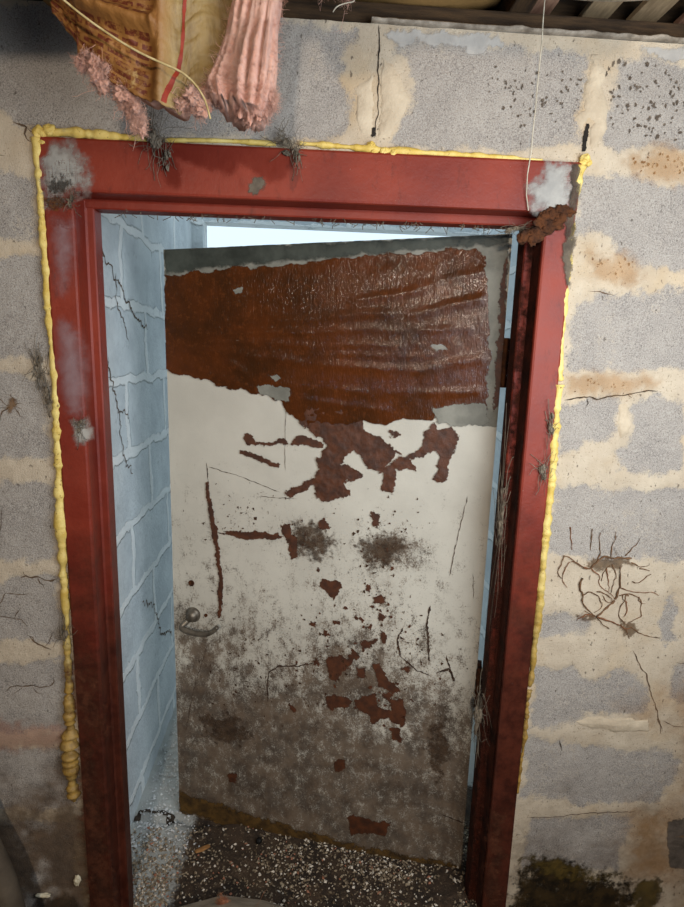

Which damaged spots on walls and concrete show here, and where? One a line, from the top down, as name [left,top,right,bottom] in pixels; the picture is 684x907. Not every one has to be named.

crack [373,29,381,138]
peeling [240,406,459,502]
peeling [224,524,298,560]
rust [164,163,581,907]
peeling [370,511,380,528]
peeling [317,567,342,600]
peeling [295,584,414,743]
peeling [334,759,345,772]
water stain [179,790,461,869]
peeling [347,814,391,836]
water stain [509,854,663,907]